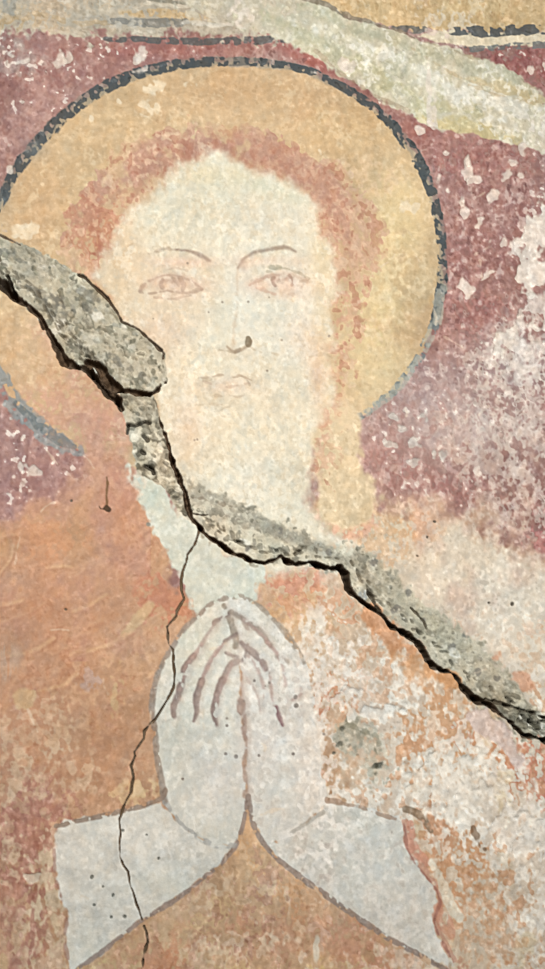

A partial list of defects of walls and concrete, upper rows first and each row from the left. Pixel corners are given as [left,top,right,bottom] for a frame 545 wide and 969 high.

peeling [53,49,74,69]
peeling [133,46,148,73]
peeling [415,118,437,136]
peeling [461,143,527,204]
peeling [459,197,485,229]
peeling [490,194,545,388]
spalling [0,237,545,878]
crack [0,274,545,967]
peeling [24,873,41,885]